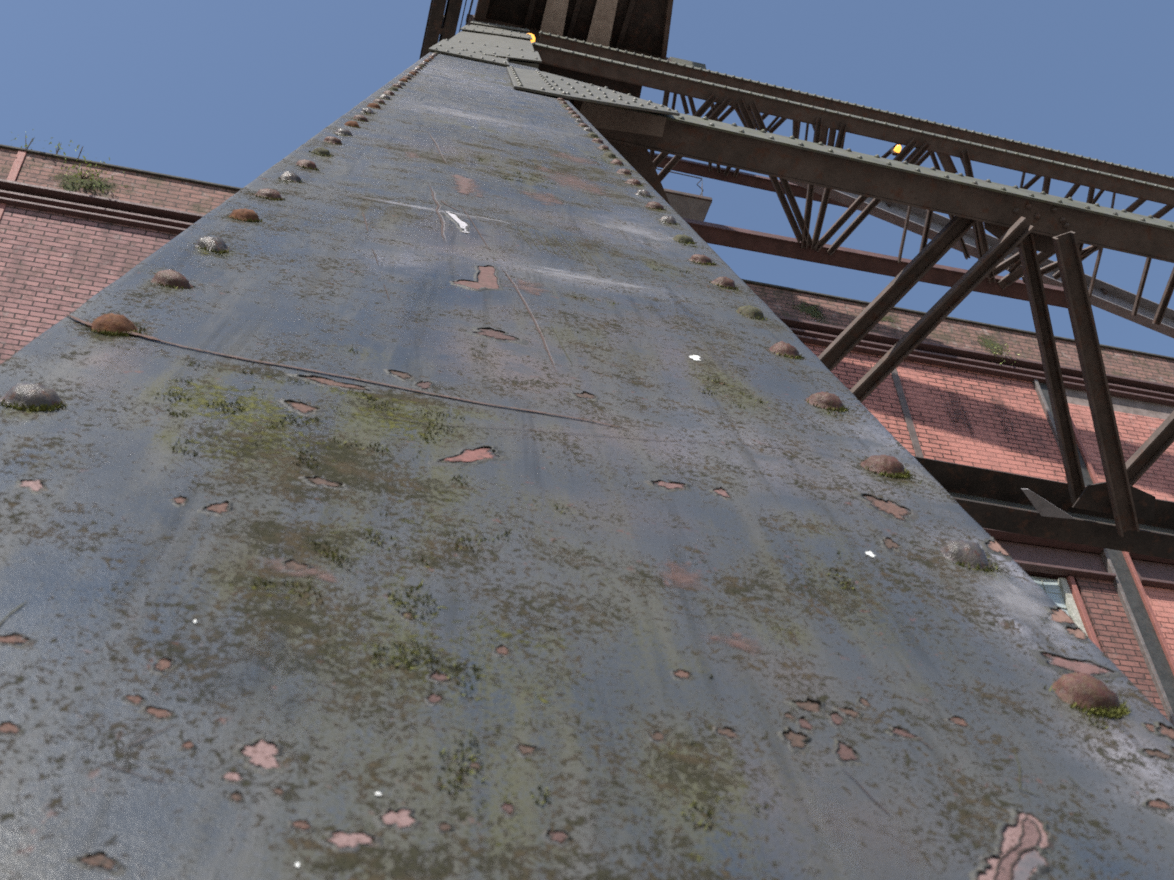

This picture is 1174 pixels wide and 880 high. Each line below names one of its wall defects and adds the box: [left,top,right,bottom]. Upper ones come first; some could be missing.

peeling [450,265,504,292]
rust [278,399,327,417]
peeling [1040,605,1091,644]
peeling [1027,649,1125,680]
peeling [230,735,287,777]
peeling [316,806,422,853]
peeling [968,808,1055,880]